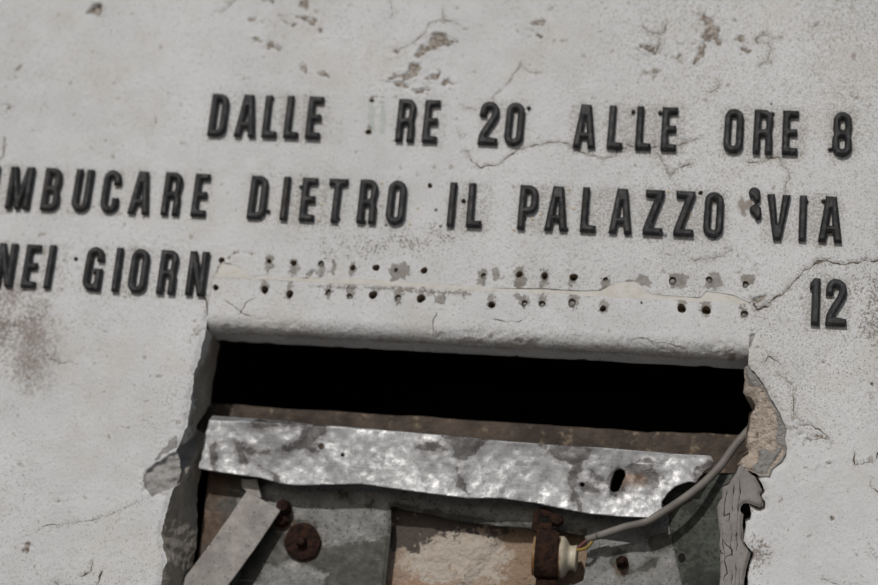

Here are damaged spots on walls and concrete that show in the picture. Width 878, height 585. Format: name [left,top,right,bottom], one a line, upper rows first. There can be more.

spalling [388,33,458,95]
crack [457,130,701,174]
crack [752,259,878,311]
spalling [738,365,787,477]
spalling [143,453,181,497]